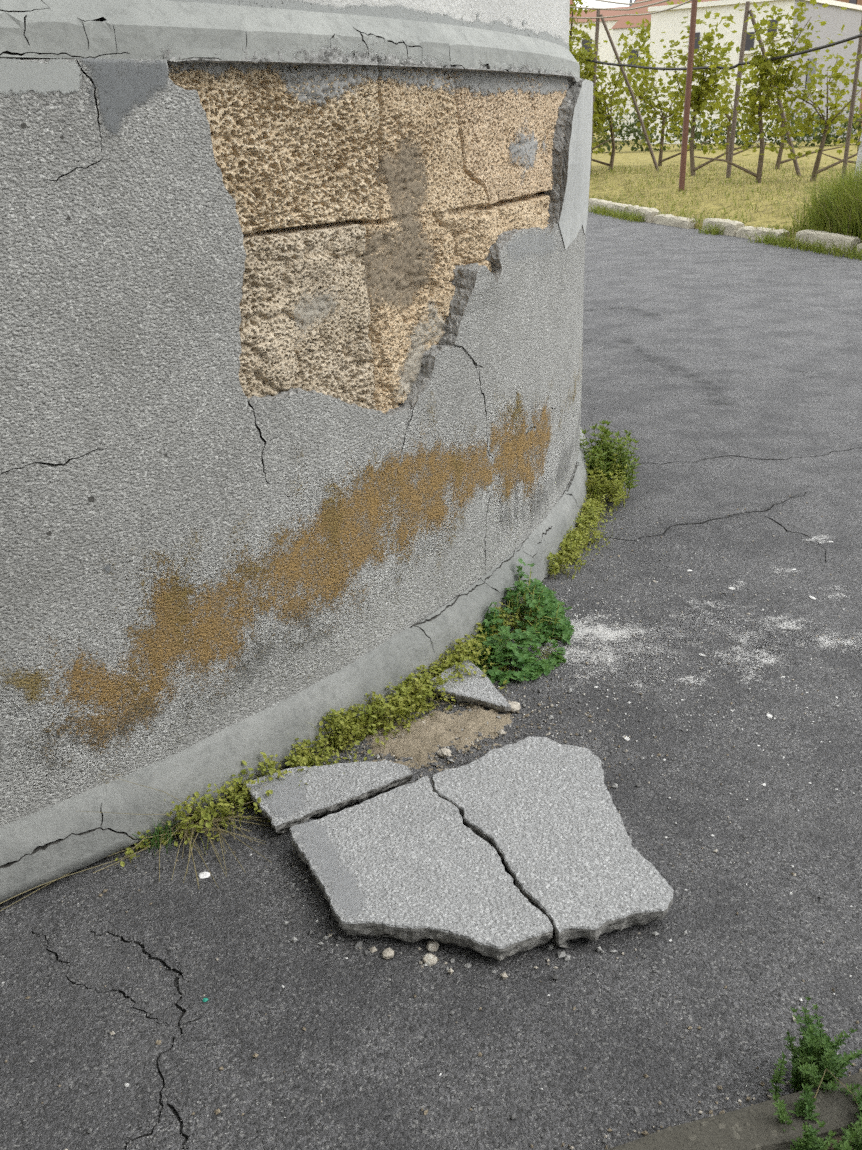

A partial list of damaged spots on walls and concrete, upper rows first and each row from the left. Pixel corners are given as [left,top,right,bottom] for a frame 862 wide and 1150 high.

crack [0,0,129,181]
spalling [163,43,577,416]
crack [412,345,553,653]
crack [563,462,580,509]
crack [603,492,827,563]
crack [0,803,141,868]
crack [31,931,201,1150]